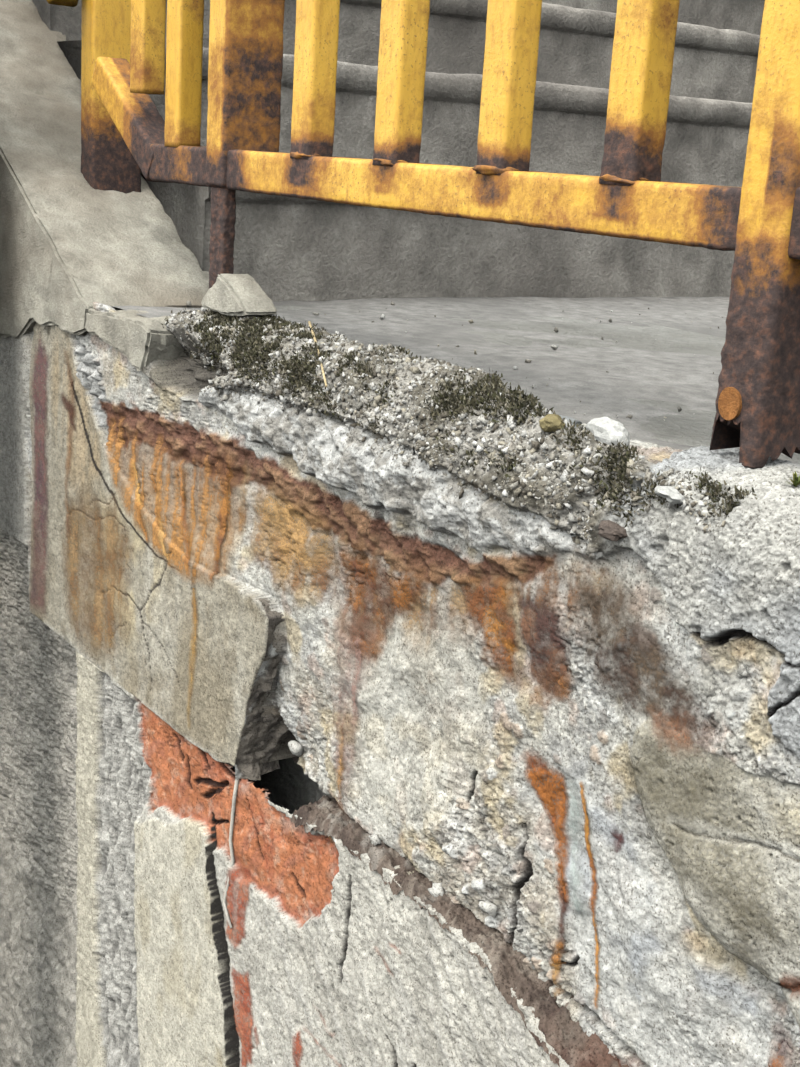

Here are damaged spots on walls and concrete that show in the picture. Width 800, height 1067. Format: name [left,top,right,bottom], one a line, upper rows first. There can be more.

crack [67,382,180,702]
corrosion [100,401,700,793]
spalling [75,302,800,1067]
crack [695,630,800,717]
corrosion [527,756,568,981]
corrosion [580,783,599,1007]
crack [675,824,800,861]